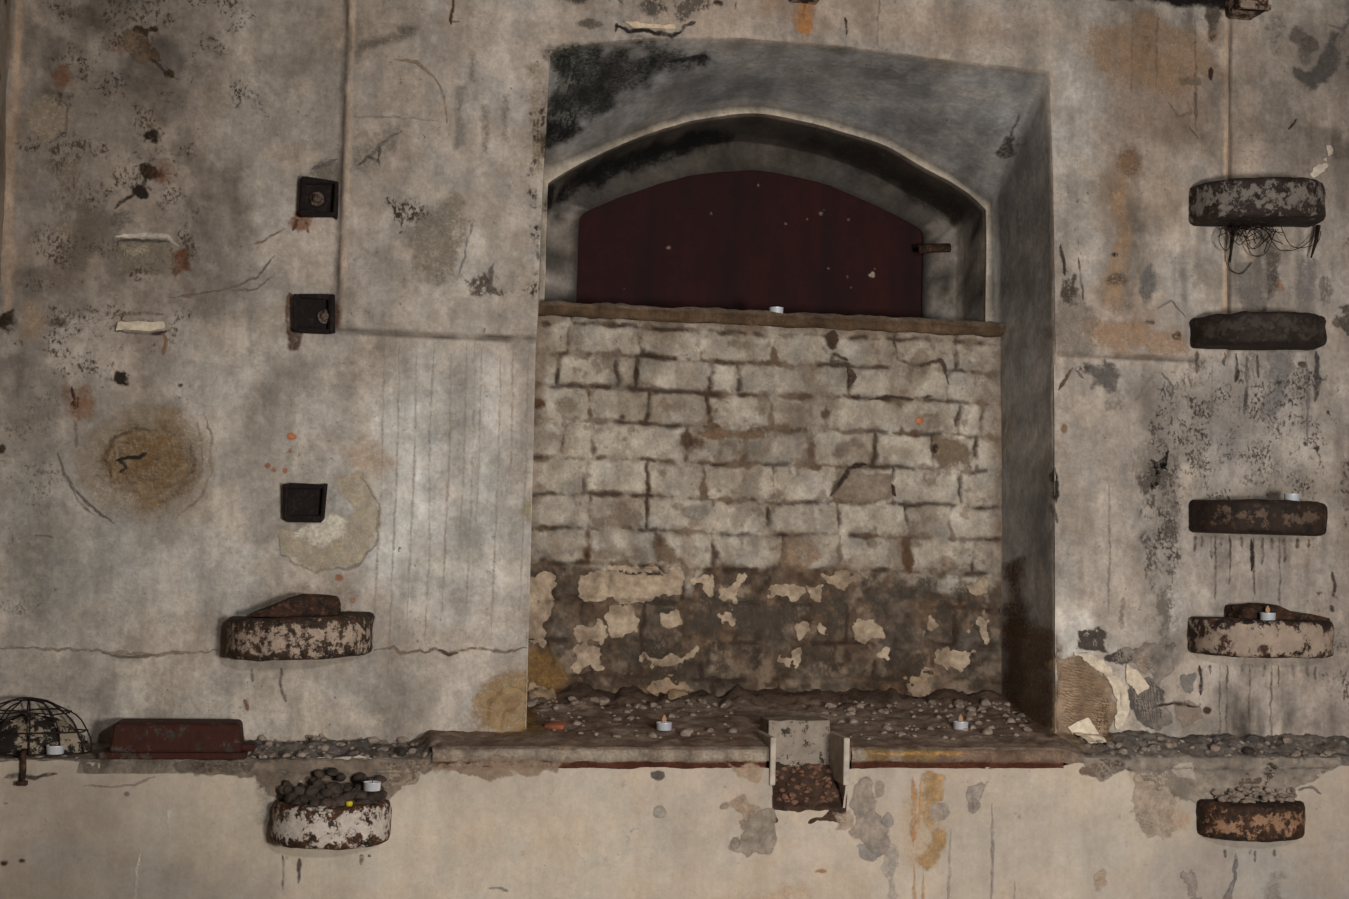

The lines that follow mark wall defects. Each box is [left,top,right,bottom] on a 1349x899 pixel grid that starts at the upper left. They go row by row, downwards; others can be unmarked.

leakage [530,39,710,165]
leakage [1090,0,1225,135]
leakage [1106,150,1140,306]
leakage [79,407,214,512]
leakage [1052,244,1332,647]
peeling [528,571,557,648]
peeling [570,534,747,674]
peeling [639,645,699,700]
peeling [767,540,861,602]
peeling [903,575,990,698]
spalling [1043,627,1341,838]
rust [872,751,968,899]